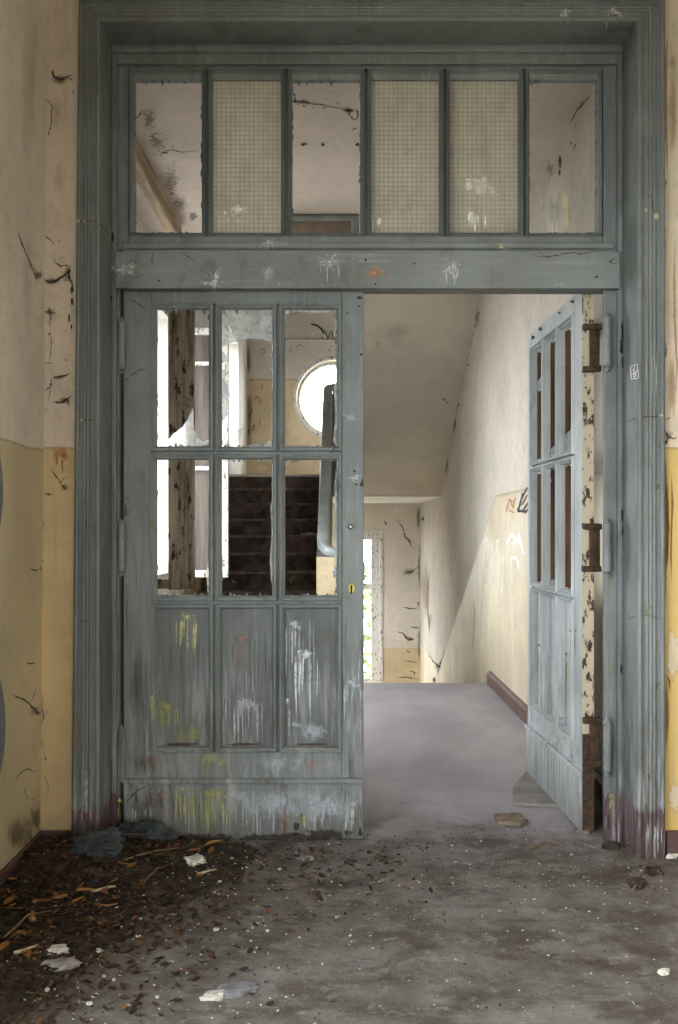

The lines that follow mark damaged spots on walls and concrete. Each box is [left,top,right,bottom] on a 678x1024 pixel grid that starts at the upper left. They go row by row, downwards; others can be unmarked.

crack [293,93,359,130]
crack [18,230,95,421]
crack [384,519,419,575]
peeling [666,628,678,682]
crack [13,663,48,799]
peeling [668,780,678,813]